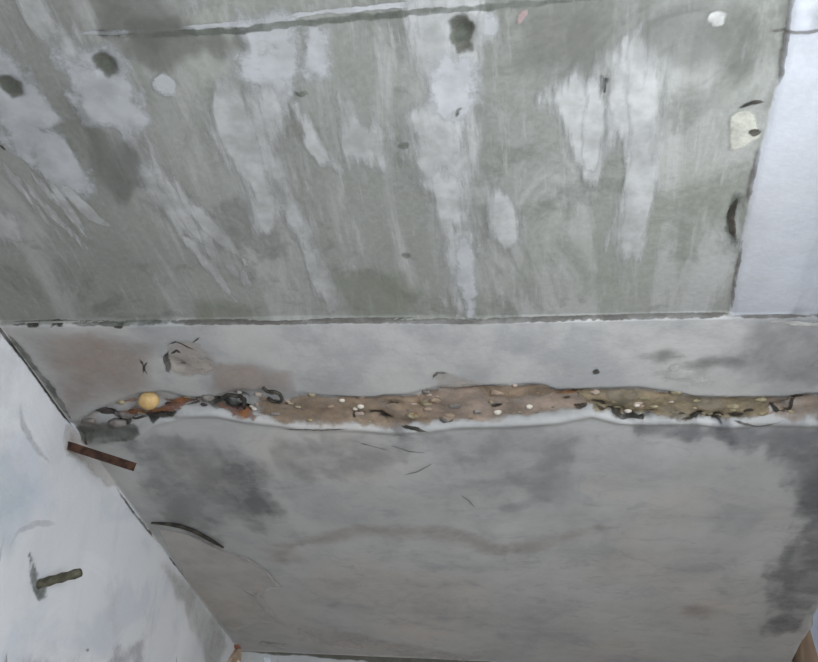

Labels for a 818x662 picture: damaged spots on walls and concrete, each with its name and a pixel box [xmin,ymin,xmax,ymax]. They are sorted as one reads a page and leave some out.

crack [775,17,818,78]
damp [0,0,235,294]
damp [210,10,386,309]
damp [403,0,498,318]
damp [538,24,660,260]
crack [747,152,759,196]
damp [489,188,518,249]
spalling [66,429,112,485]
corrosion [30,560,45,599]